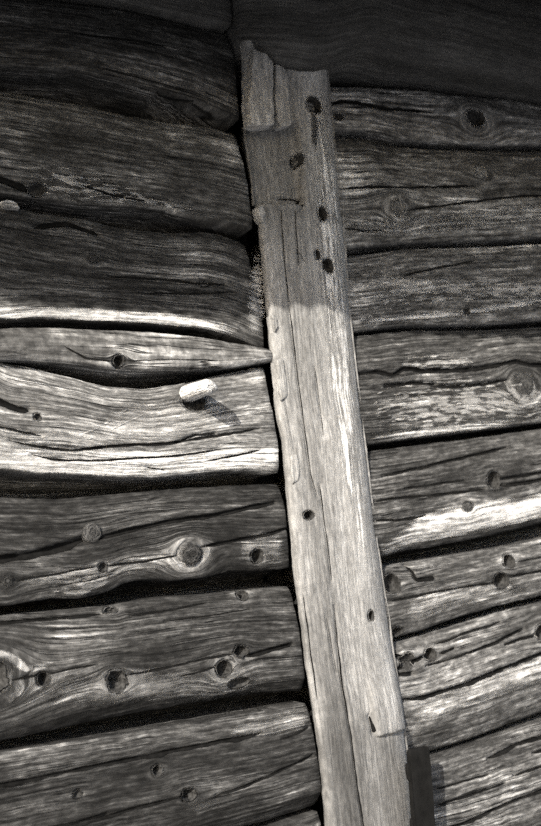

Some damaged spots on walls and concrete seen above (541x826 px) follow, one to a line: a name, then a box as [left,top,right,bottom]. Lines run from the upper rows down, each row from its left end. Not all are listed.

crack [358,359,541,388]
crack [0,398,261,470]
crack [436,735,541,826]